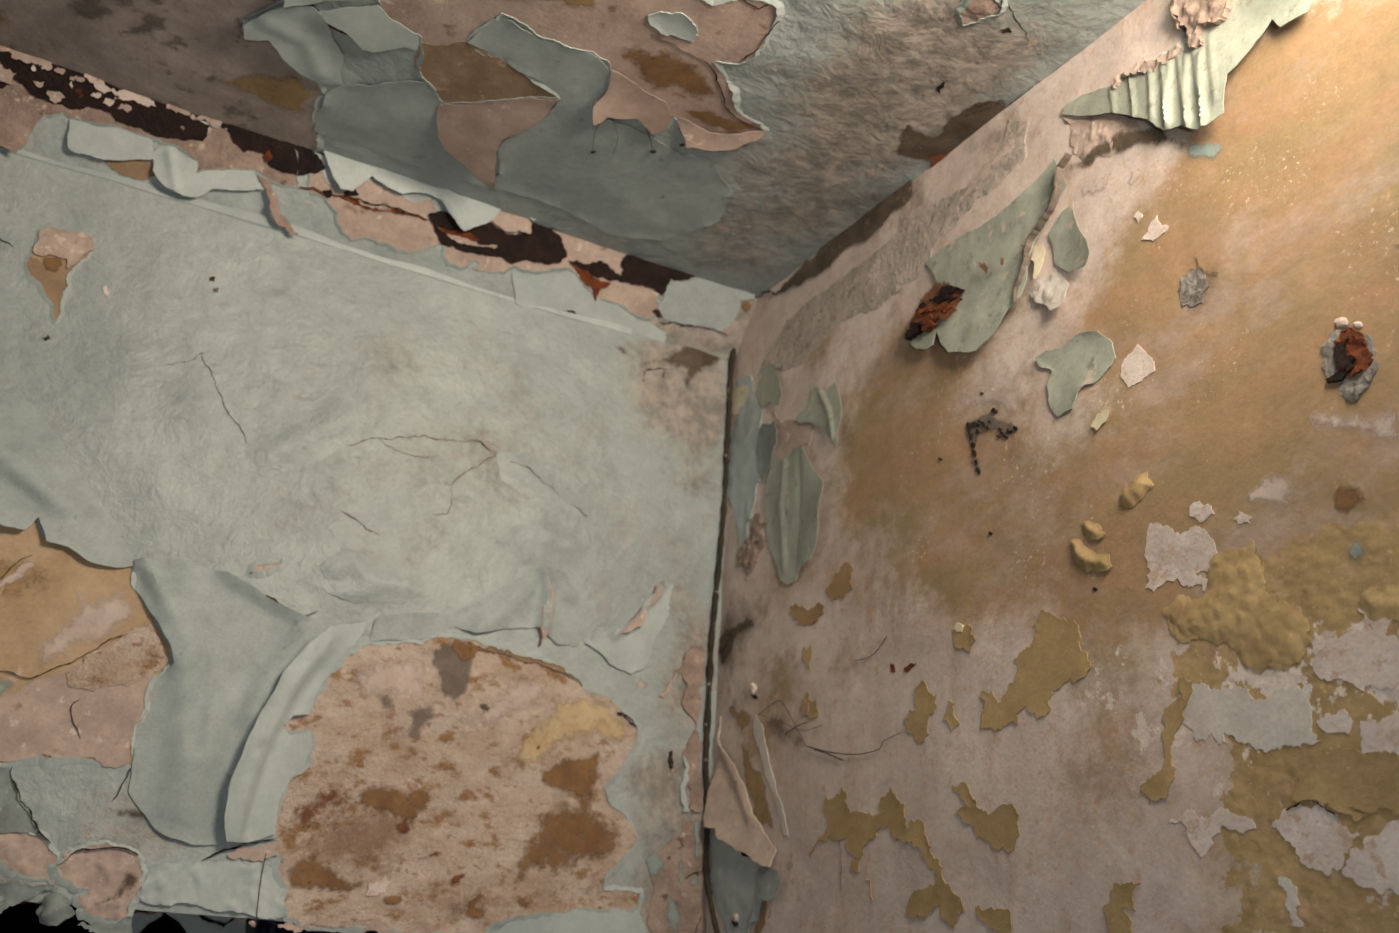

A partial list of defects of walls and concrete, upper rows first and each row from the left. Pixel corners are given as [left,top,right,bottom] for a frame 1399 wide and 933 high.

peeling [0,0,785,326]
rust [435,224,479,242]
flaking render [732,118,1029,585]
rust [909,281,962,329]
flaking render [1144,501,1217,592]
flaking render [1233,475,1291,524]
peeling [0,517,174,769]
flaking render [1183,609,1399,755]
peeling [271,633,707,933]
flaking render [0,829,246,933]
flaking render [1168,803,1399,895]
flaking render [1277,876,1303,927]